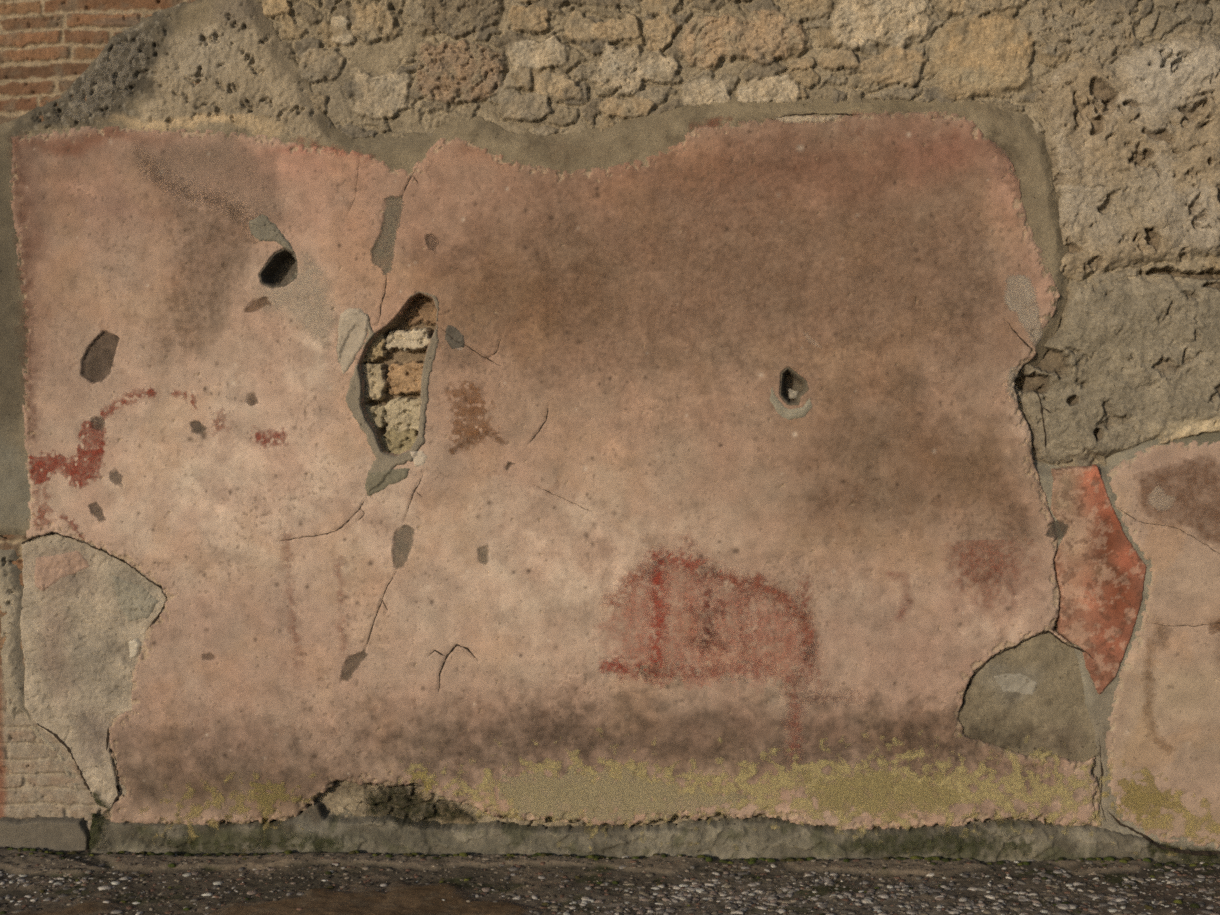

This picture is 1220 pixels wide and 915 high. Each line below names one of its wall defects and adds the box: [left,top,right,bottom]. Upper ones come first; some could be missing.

flaking render [1005,275,1042,345]
flaking render [82,332,119,382]
crack [1113,505,1220,576]
crack [366,577,393,645]
flaking render [20,533,168,810]
crack [429,644,476,692]
flaking render [958,631,1099,762]